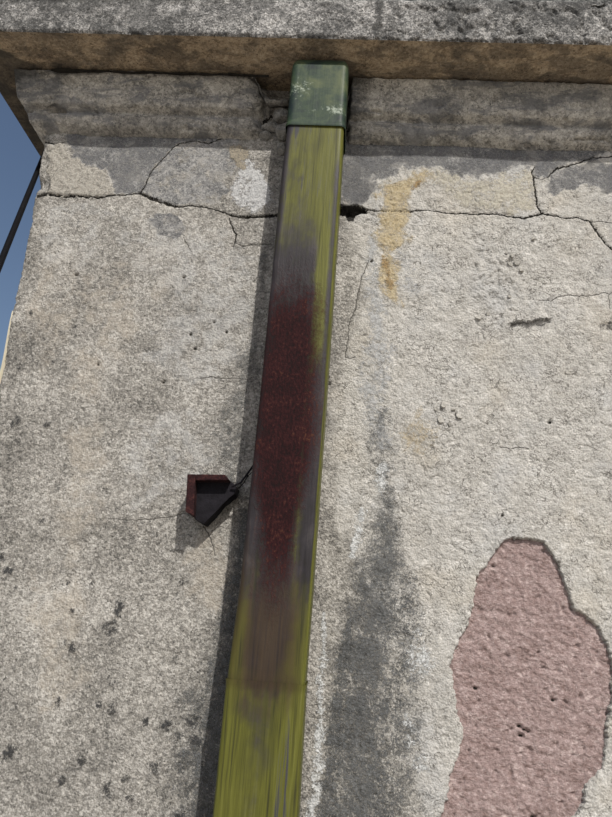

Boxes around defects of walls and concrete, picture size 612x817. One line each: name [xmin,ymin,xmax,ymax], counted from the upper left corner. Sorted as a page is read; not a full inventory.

crack [37,138,278,247]
rust [371,169,433,307]
crack [340,156,612,250]
crack [345,260,369,359]
crack [539,292,612,308]
crack [108,513,185,521]
water stain [305,232,435,817]
flaking render [441,538,612,817]